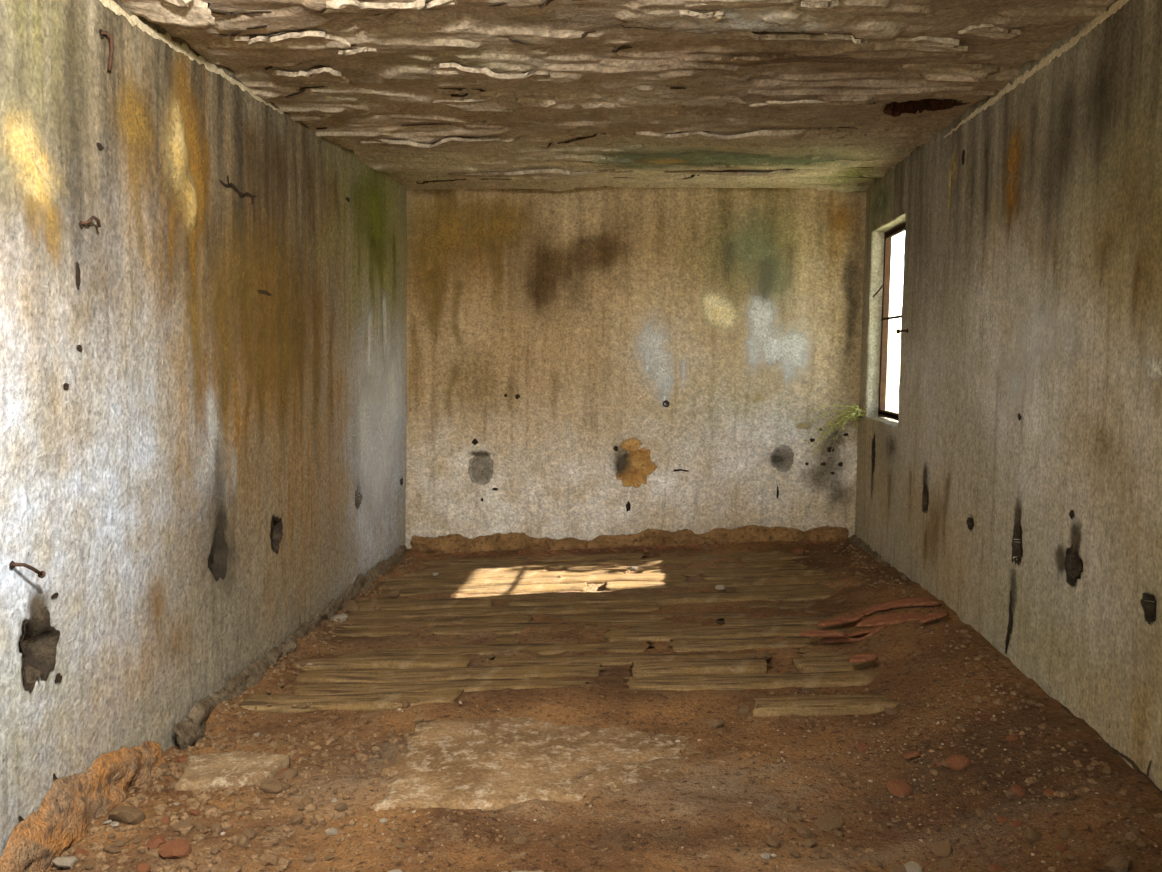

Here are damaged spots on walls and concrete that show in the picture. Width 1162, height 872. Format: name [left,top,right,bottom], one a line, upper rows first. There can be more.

peeling [99,0,283,114]
crack [205,2,272,37]
peeling [230,30,378,84]
peeling [323,0,457,14]
crack [581,30,632,53]
damp [122,87,149,152]
crack [401,88,486,126]
crack [547,133,605,147]
damp [202,234,333,480]
spalling [19,593,62,694]
spalling [172,525,908,753]
crack [1005,590,1013,654]